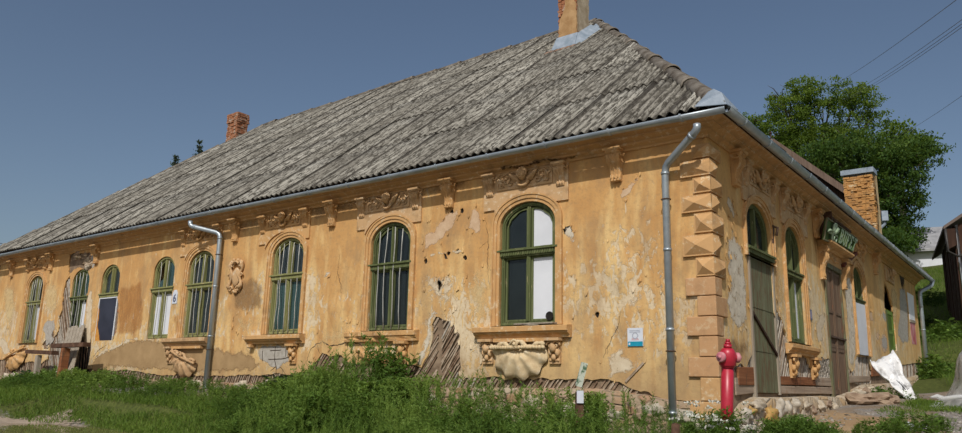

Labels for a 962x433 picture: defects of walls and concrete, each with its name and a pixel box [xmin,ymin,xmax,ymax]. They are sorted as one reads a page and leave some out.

peeling [421,202,485,257]
peeling [725,198,750,331]
peeling [422,271,482,364]
peeling [845,278,897,371]